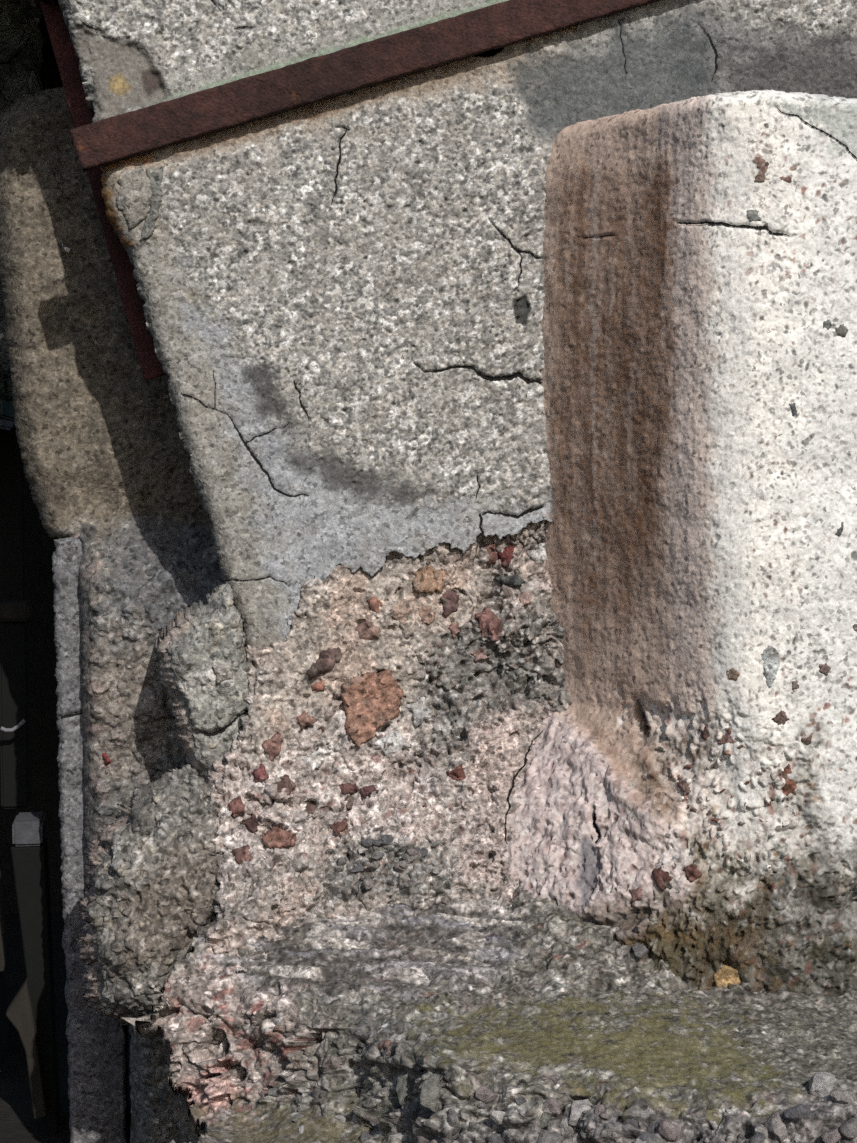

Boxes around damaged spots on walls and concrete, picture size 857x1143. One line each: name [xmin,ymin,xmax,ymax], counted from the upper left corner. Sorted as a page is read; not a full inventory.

crack [698,22,718,81]
corrosion [101,155,152,247]
crack [331,126,350,205]
crack [678,221,789,236]
crack [775,106,857,159]
crack [414,363,542,384]
corrosion [554,166,666,542]
crack [181,370,310,497]
spalling [155,512,573,974]
crack [505,731,543,844]